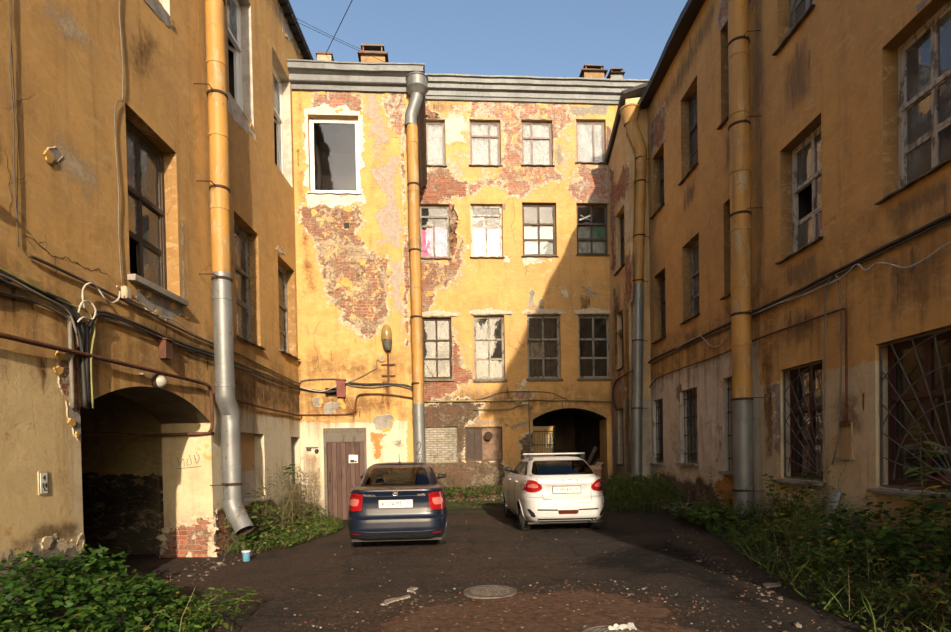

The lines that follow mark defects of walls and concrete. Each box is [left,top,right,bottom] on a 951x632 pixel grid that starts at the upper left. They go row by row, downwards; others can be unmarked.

flaking render [227,92,257,144]
flaking render [649,102,667,154]
crack [5,146,115,282]
flaking render [295,91,633,493]
flaking render [156,503,237,558]
flaking render [0,533,87,632]